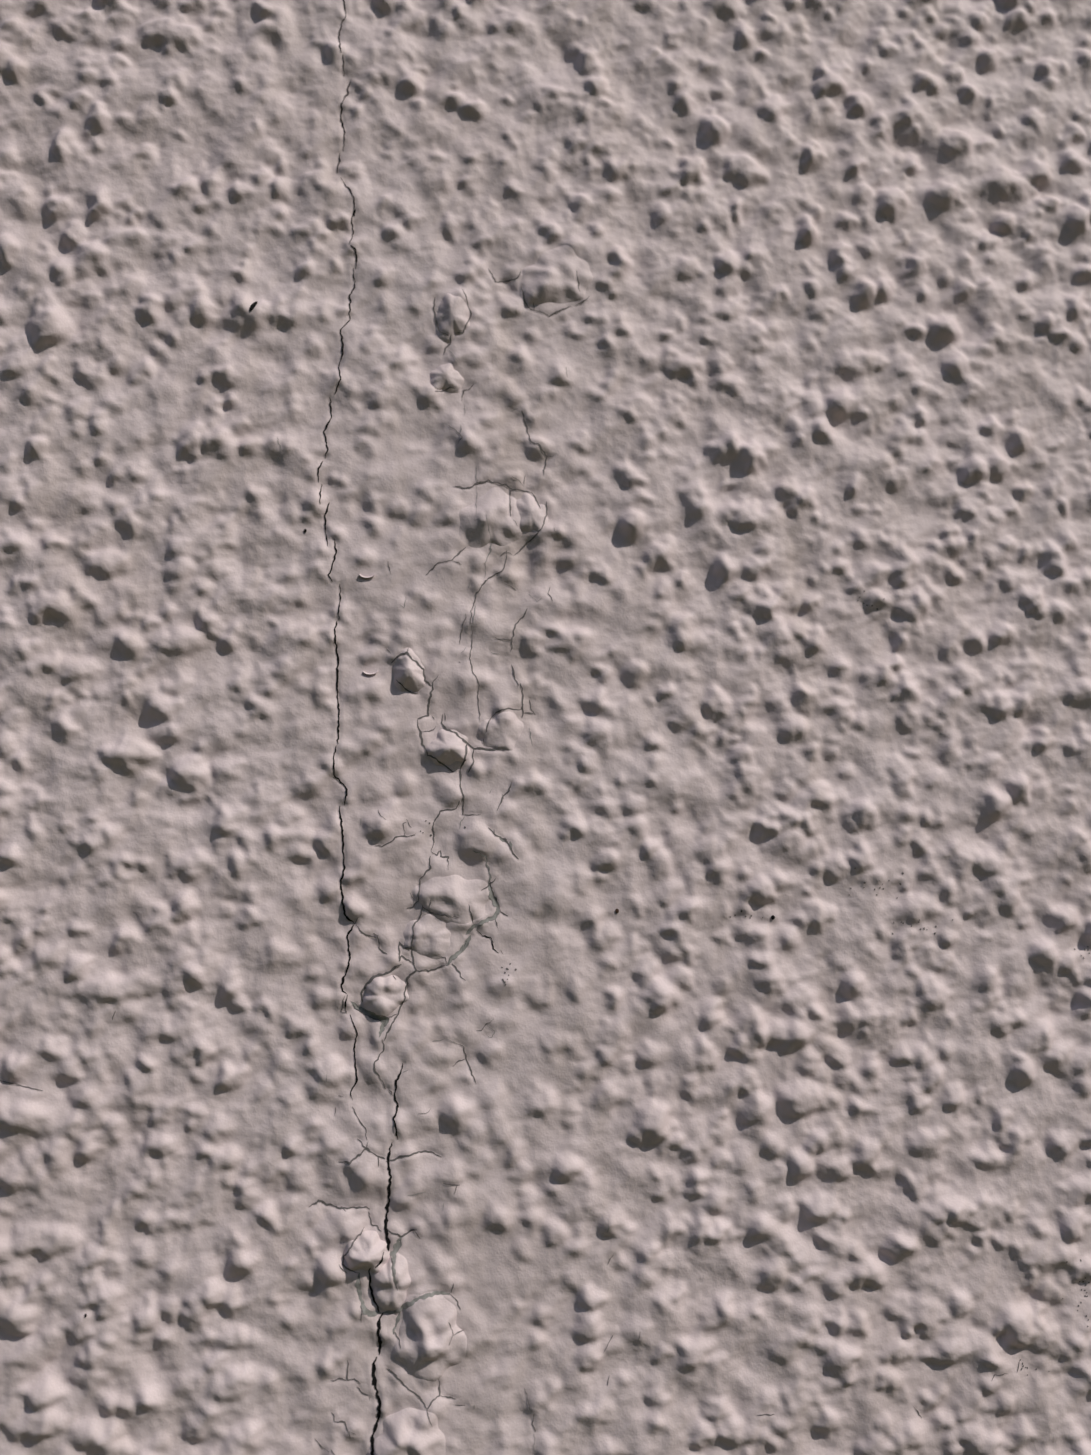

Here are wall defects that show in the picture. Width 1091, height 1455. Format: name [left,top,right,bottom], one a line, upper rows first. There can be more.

crack [309,0,589,1455]